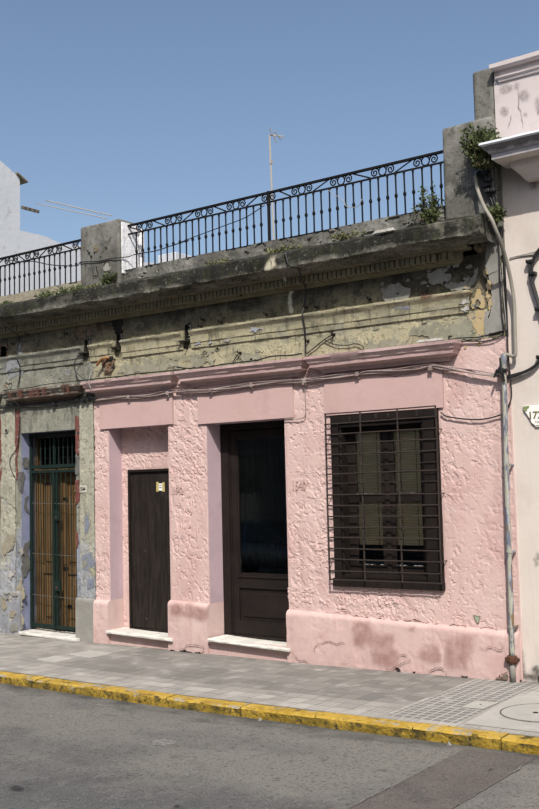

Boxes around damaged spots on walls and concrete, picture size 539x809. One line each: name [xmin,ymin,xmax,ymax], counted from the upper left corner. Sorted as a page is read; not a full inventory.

peeling [380,279,411,301]
peeling [421,264,493,346]
peeling [15,410,29,514]
peeling [0,534,30,632]